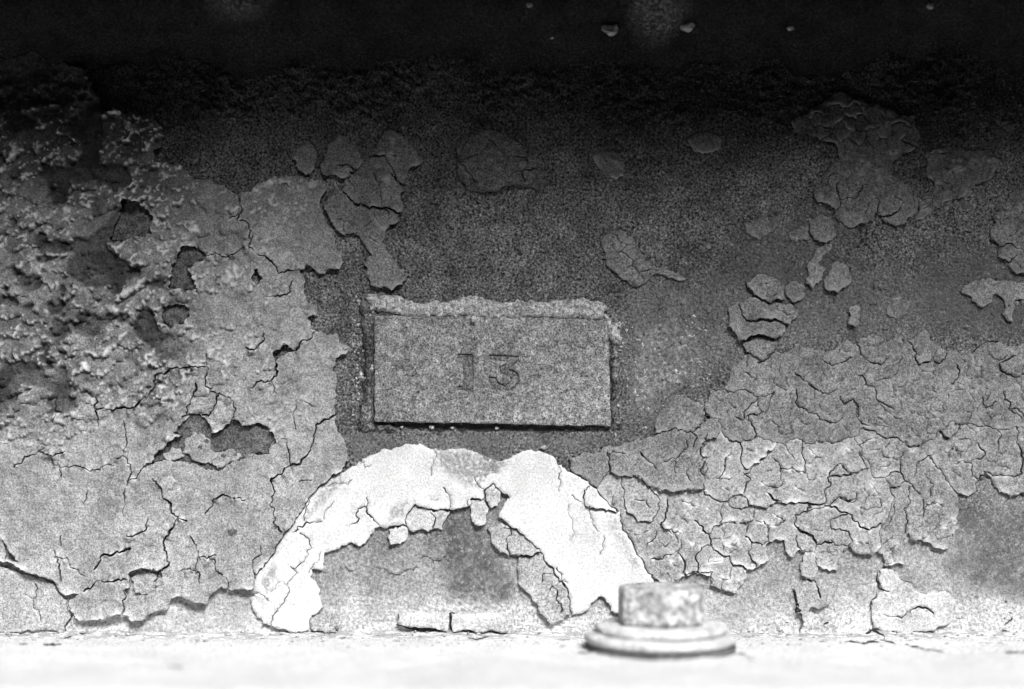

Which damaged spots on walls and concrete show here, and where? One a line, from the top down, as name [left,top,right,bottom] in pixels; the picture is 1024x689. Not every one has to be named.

crack [202,194,294,297]
peeling [320,130,423,291]
peeling [600,229,688,287]
crack [86,362,236,424]
peeling [0,52,351,633]
crack [247,330,318,391]
crack [16,434,229,646]
crack [208,402,369,619]
crack [396,612,508,640]
peeling [251,330,1024,633]
crack [391,340,1024,632]
crack [846,571,944,652]